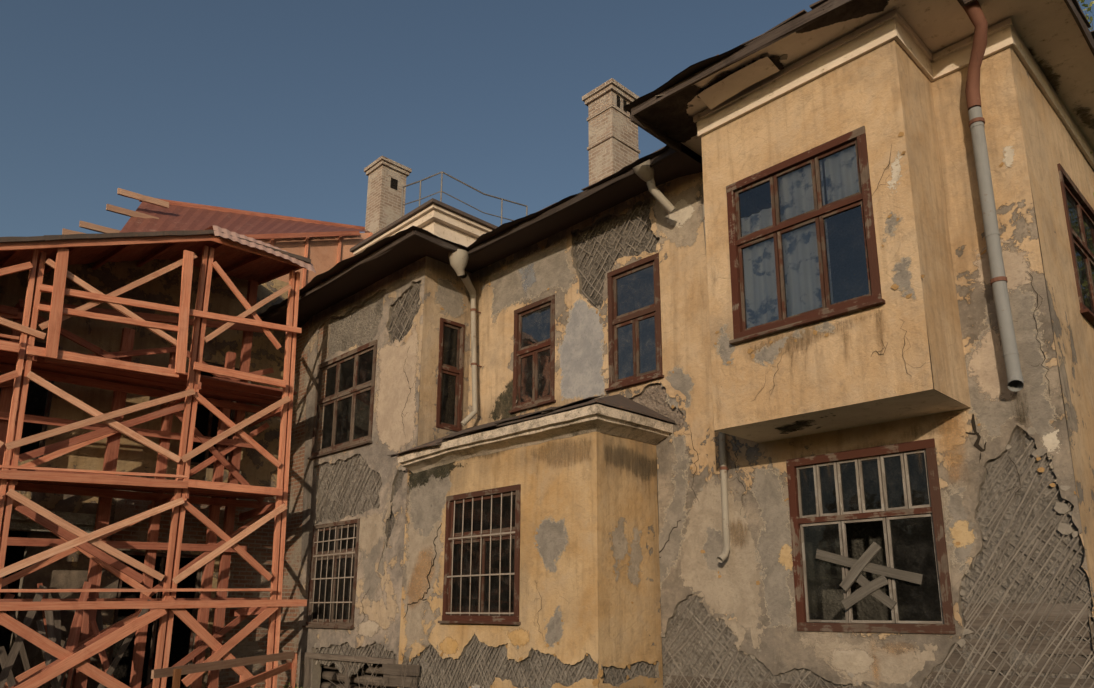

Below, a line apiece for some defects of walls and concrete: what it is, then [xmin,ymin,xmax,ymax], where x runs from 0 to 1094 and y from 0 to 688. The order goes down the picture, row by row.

water stain [1028,48,1060,91]
peeling [882,212,903,248]
flaking render [488,180,703,401]
flaking render [312,239,1094,688]
crack [403,523,442,619]